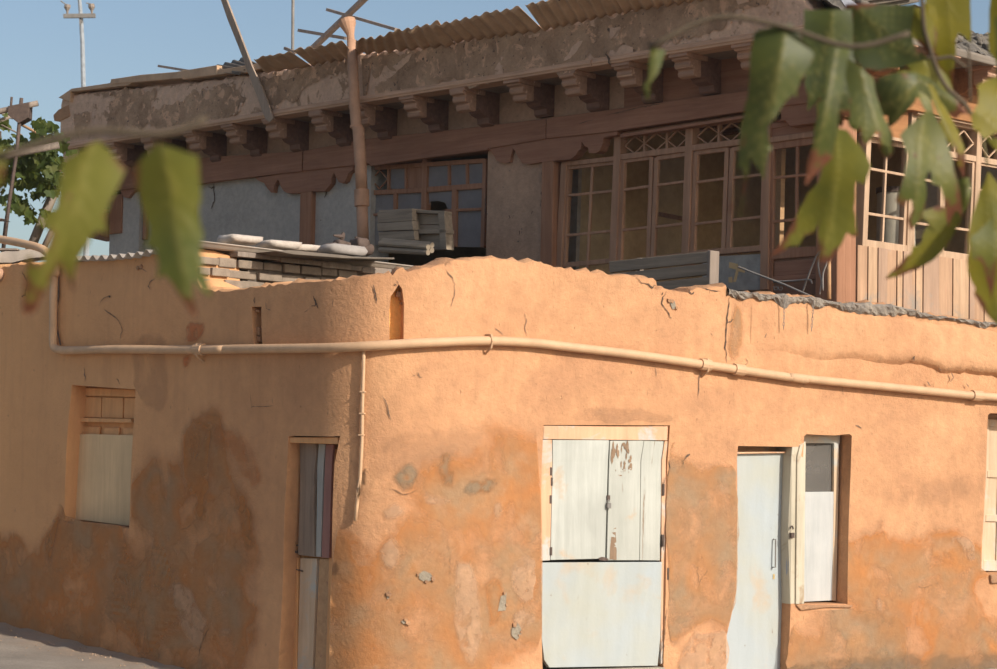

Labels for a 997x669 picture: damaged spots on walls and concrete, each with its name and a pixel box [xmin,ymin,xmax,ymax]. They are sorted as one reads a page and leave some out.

flaking render [106,83,246,129]
flaking render [259,59,346,110]
crack [689,288,748,362]
damp [0,414,259,669]
damp [329,434,543,669]
damp [666,462,739,669]
damp [786,531,997,669]